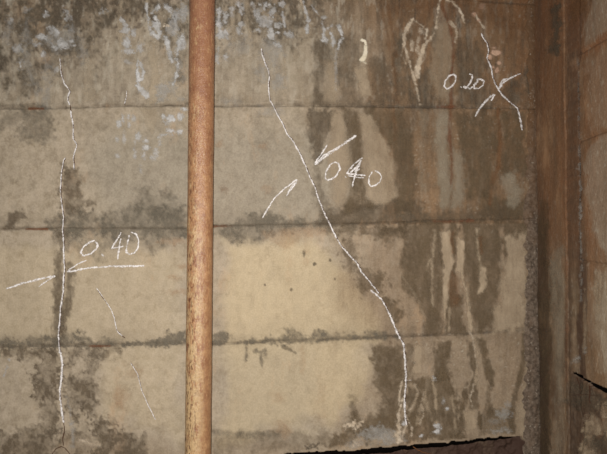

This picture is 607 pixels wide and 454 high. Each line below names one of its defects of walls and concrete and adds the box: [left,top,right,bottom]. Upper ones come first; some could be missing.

crack [52,58,77,454]
water stain [0,0,184,103]
water stain [58,166,126,240]
water stain [157,107,186,138]
crack [262,50,408,425]
water stain [307,25,528,334]
crack [482,34,523,129]
water stain [0,260,186,454]
water stain [331,332,493,446]
water stain [509,367,527,439]